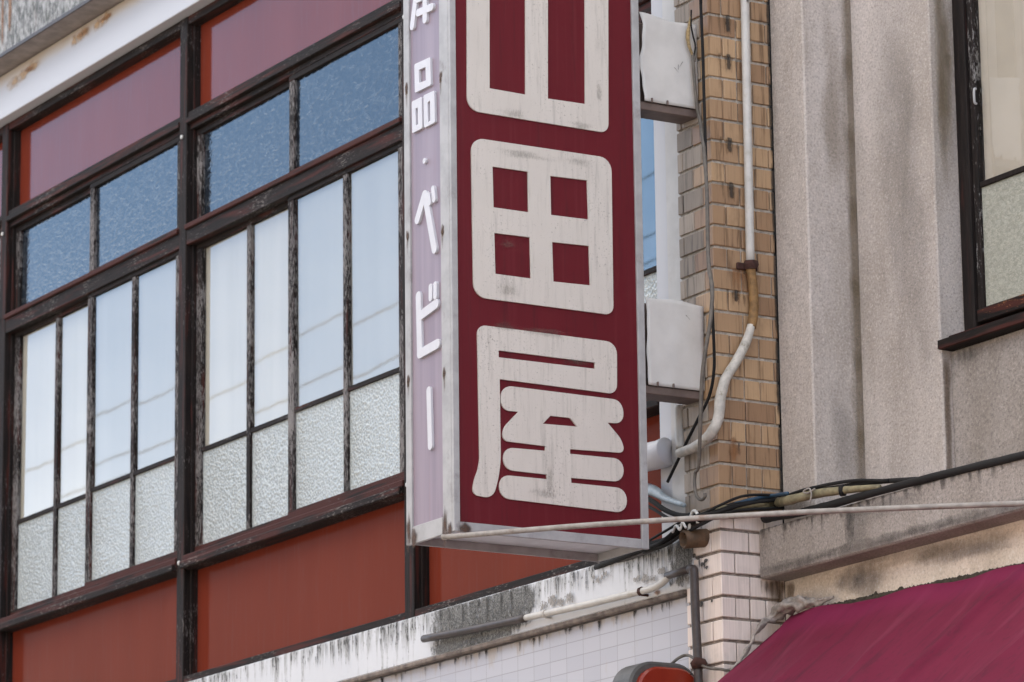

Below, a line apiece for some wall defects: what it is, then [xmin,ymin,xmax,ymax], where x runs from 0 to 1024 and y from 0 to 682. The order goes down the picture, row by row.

water stain [628,541,693,586]
water stain [768,582,793,603]
water stain [417,585,547,664]